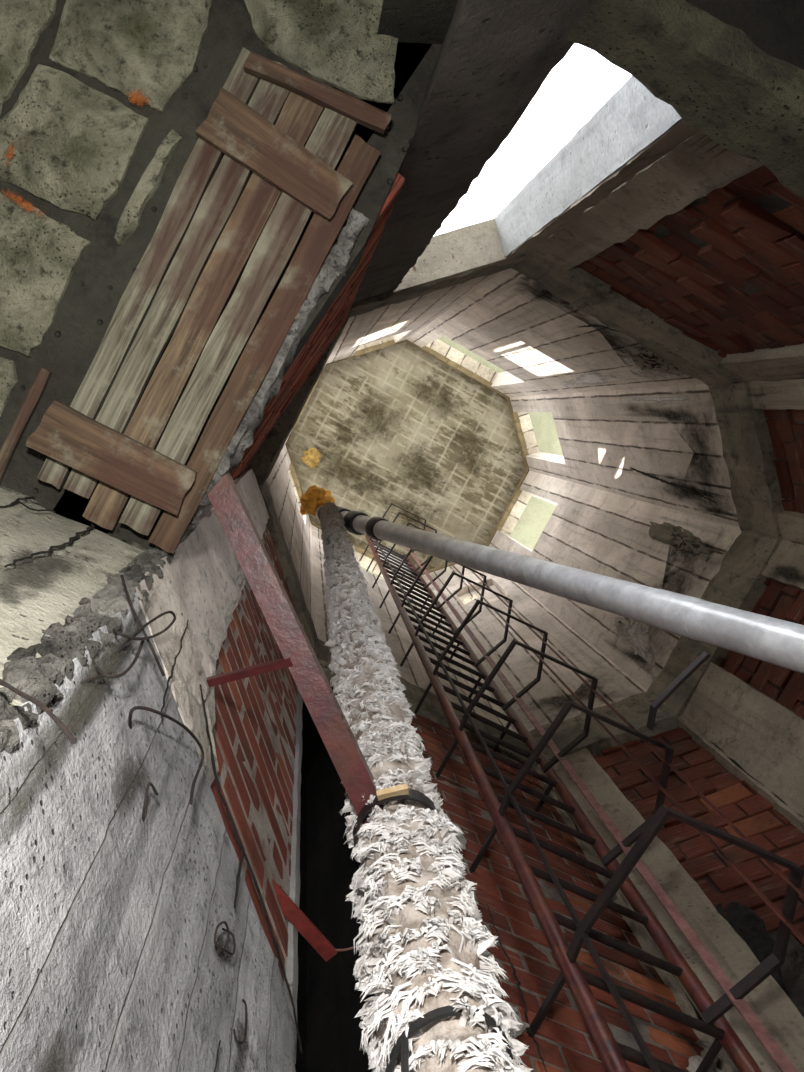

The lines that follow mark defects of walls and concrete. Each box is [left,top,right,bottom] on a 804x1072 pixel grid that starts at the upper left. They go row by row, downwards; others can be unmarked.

damp [416,383,453,415]
mould [322,392,400,492]
damp [399,447,438,488]
damp [629,396,734,516]
crack [0,496,55,512]
spalling [0,208,369,786]
crack [3,523,96,568]
damp [662,535,708,595]
spalling [686,1040,724,1072]